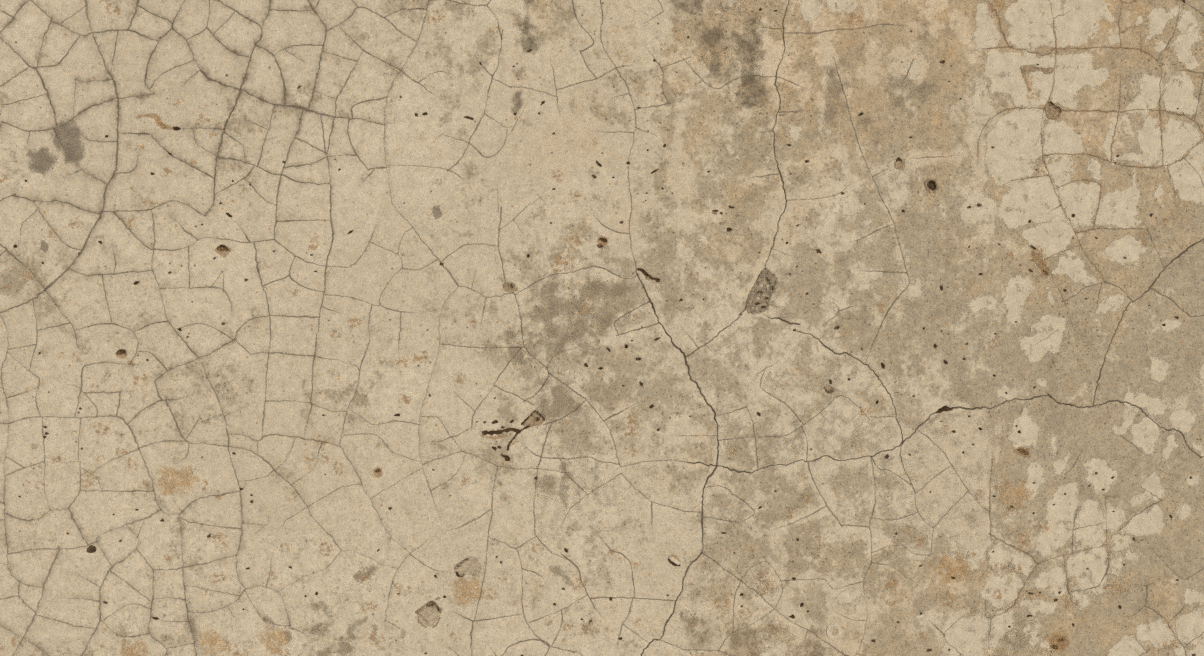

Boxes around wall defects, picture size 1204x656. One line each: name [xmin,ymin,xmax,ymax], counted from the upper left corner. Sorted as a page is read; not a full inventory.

crack [531,0,894,280]
spalling [717,268,778,355]
water stain [738,19,763,105]
crack [401,65,1110,656]
peeling [800,0,859,24]
peeling [876,169,939,210]
crack [952,0,1204,458]
peeling [959,0,1204,363]
peeling [1149,355,1169,382]
crack [5,392,337,651]
peeling [760,362,1204,656]
crack [1130,561,1204,656]